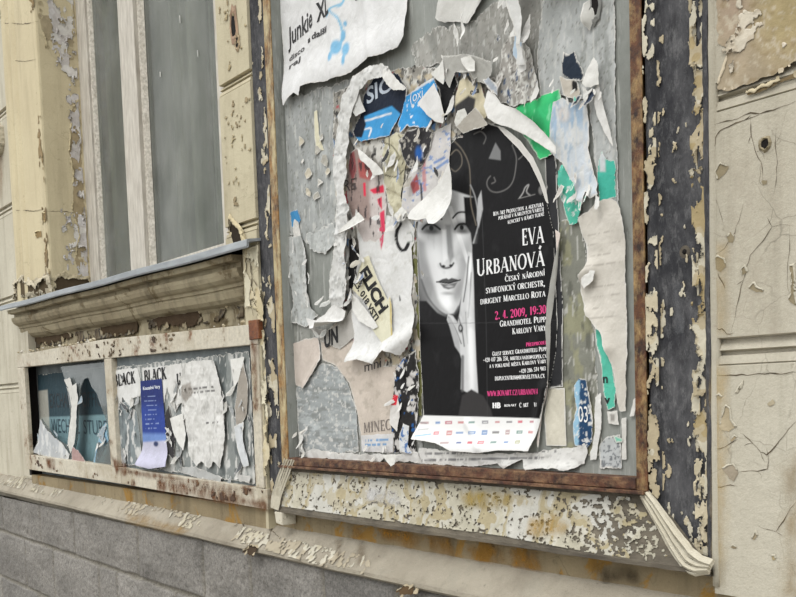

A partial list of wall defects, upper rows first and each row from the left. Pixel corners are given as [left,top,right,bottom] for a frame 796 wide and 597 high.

peeling [716,0,796,95]
peeling [12,0,91,302]
peeling [642,97,665,225]
crack [715,103,791,192]
peeling [667,0,708,556]
crack [717,220,790,335]
peeling [35,197,280,493]
peeling [645,235,674,499]
crack [717,370,790,378]
corrosion [153,474,266,509]
peeling [281,471,667,561]
crack [718,429,789,488]